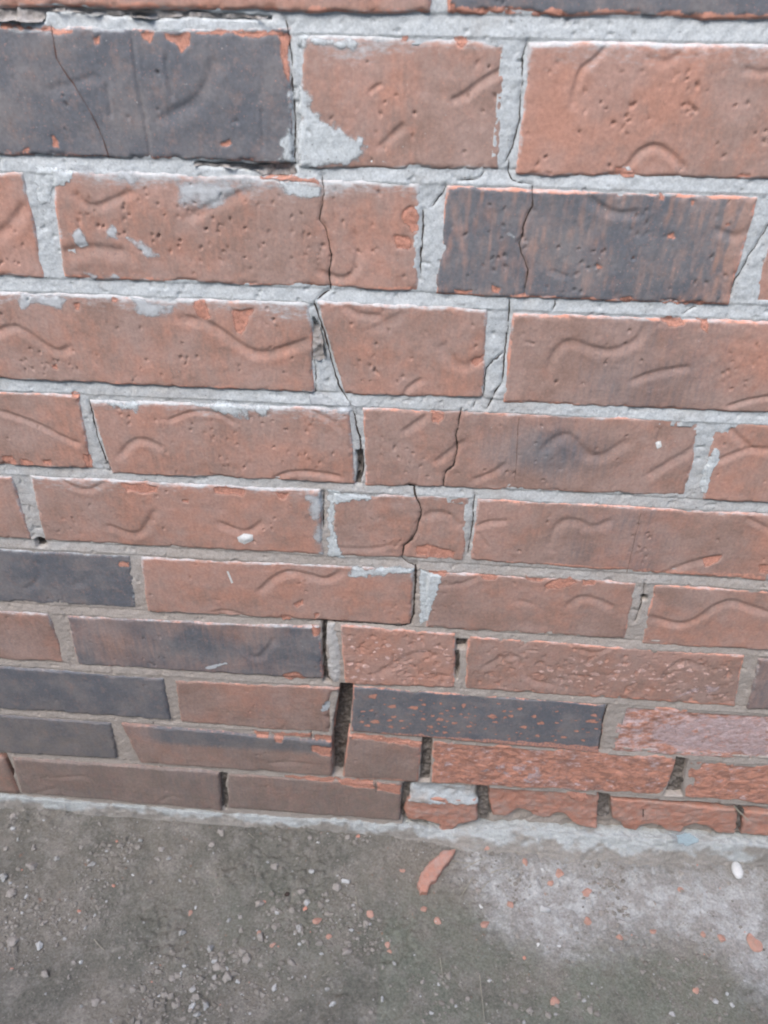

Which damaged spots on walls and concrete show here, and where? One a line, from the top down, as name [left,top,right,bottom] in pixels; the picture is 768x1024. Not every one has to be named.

crack [51,25,110,159]
crack [314,175,362,451]
crack [420,40,533,485]
crack [317,484,422,626]
spalling [252,613,768,836]